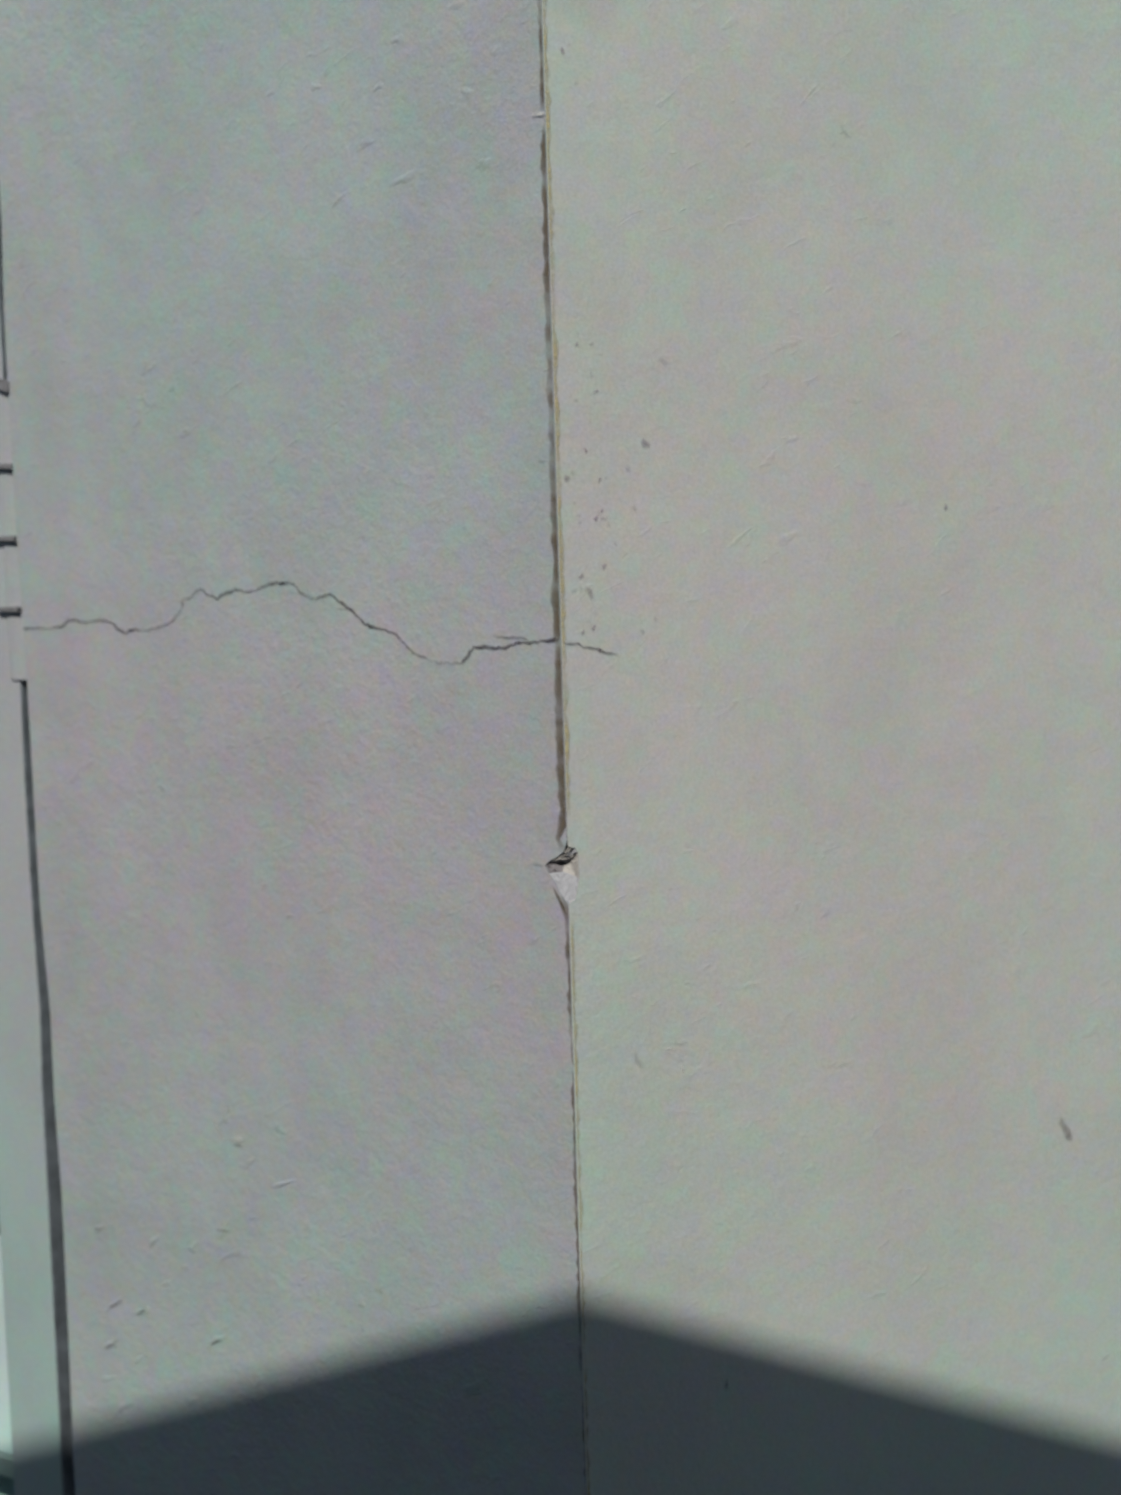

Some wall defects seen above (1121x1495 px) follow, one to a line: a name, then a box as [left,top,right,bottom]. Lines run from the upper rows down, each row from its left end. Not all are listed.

crack [324,593,399,638]
spalling [546,847,579,911]